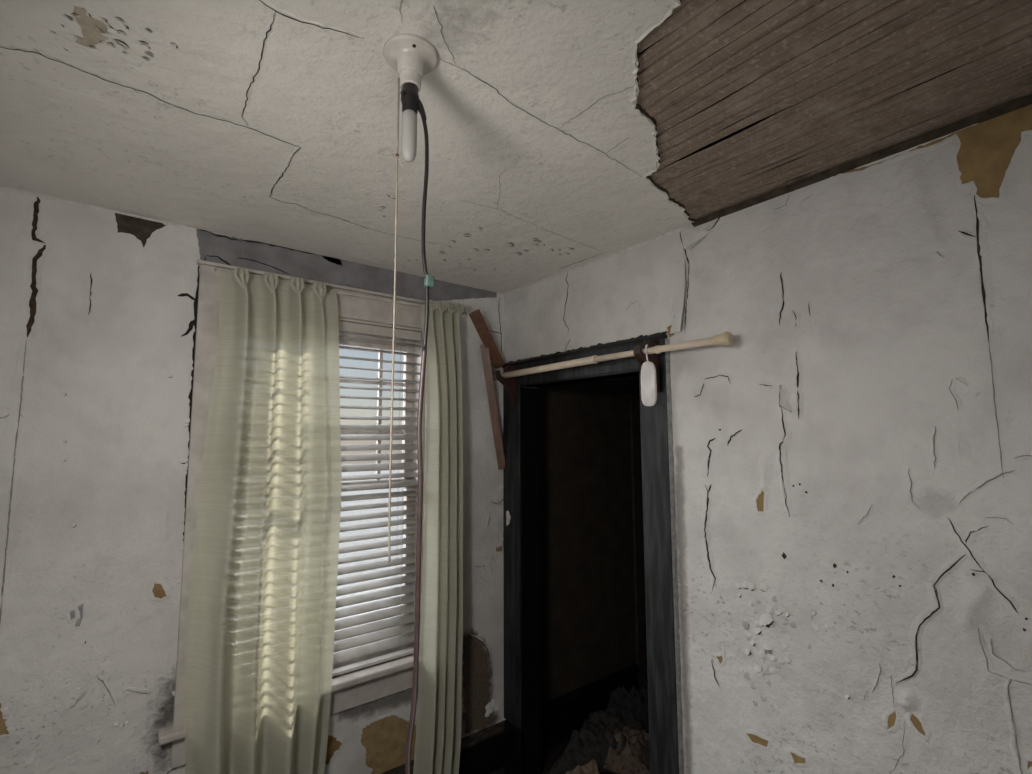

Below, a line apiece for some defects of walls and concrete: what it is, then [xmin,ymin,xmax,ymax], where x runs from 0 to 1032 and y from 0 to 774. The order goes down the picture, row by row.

crack [1,0,432,243]
crack [434,8,642,177]
peeling [630,0,1032,227]
crack [86,274,94,315]
peeling [109,212,171,254]
crack [680,233,689,334]
crack [777,272,785,325]
crack [0,245,46,623]
crack [864,195,1032,774]
peeling [325,711,417,774]
damp [462,629,498,735]
peeling [735,580,797,707]